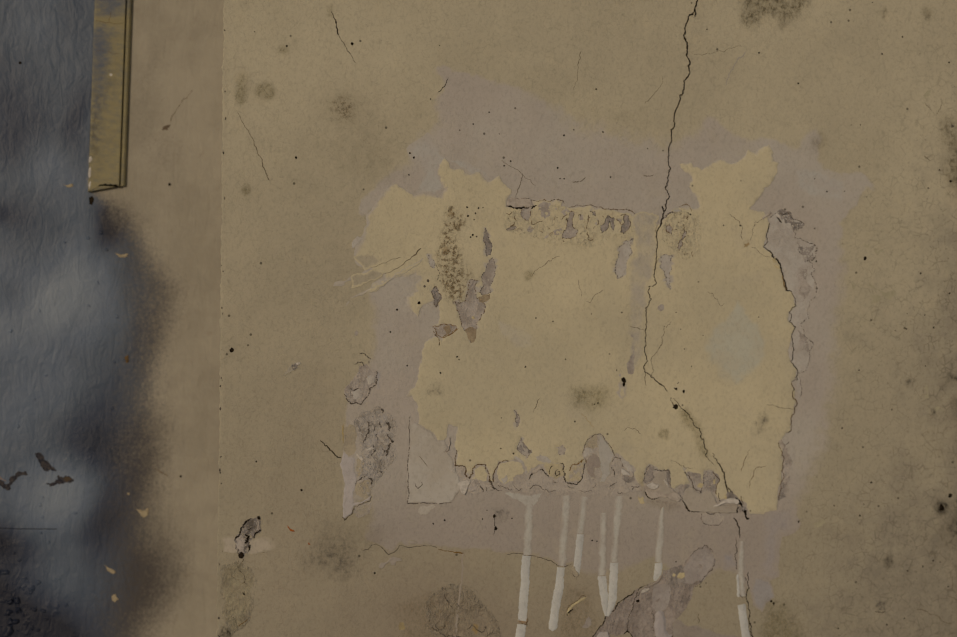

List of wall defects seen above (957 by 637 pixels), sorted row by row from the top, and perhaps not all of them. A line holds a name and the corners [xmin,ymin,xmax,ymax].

peeling [218,516,261,637]
peeling [342,228,772,637]
peeling [357,64,879,523]
crack [633,0,765,637]
crack [730,214,798,433]